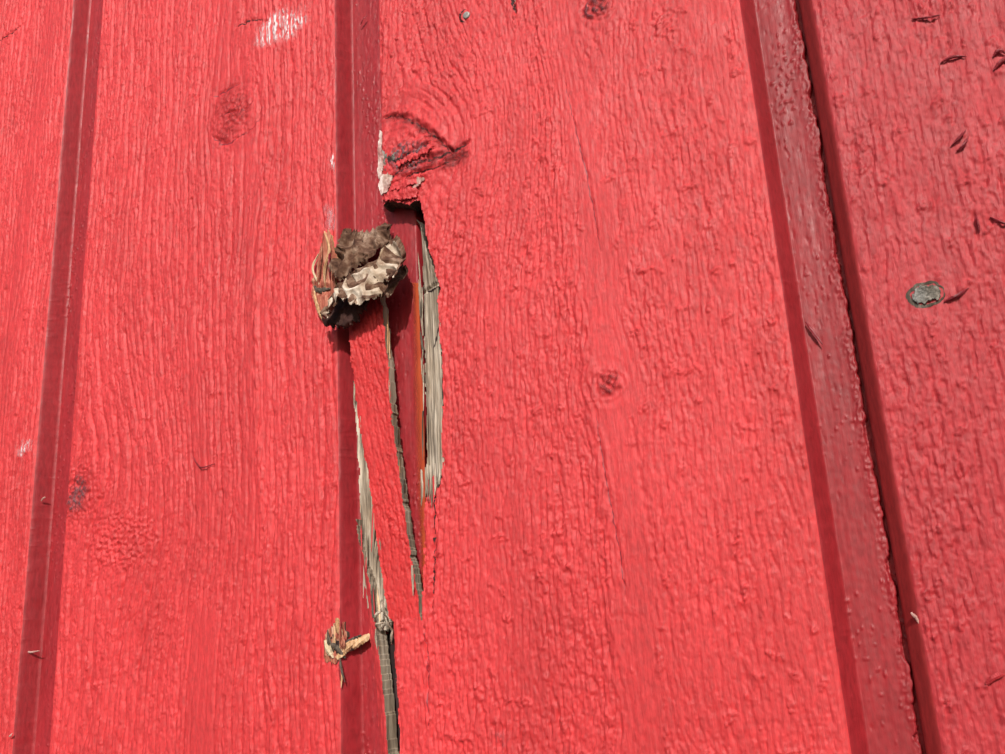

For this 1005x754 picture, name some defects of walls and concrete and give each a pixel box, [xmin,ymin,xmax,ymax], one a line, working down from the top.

spalling [349,220,445,754]
crack [423,489,437,726]